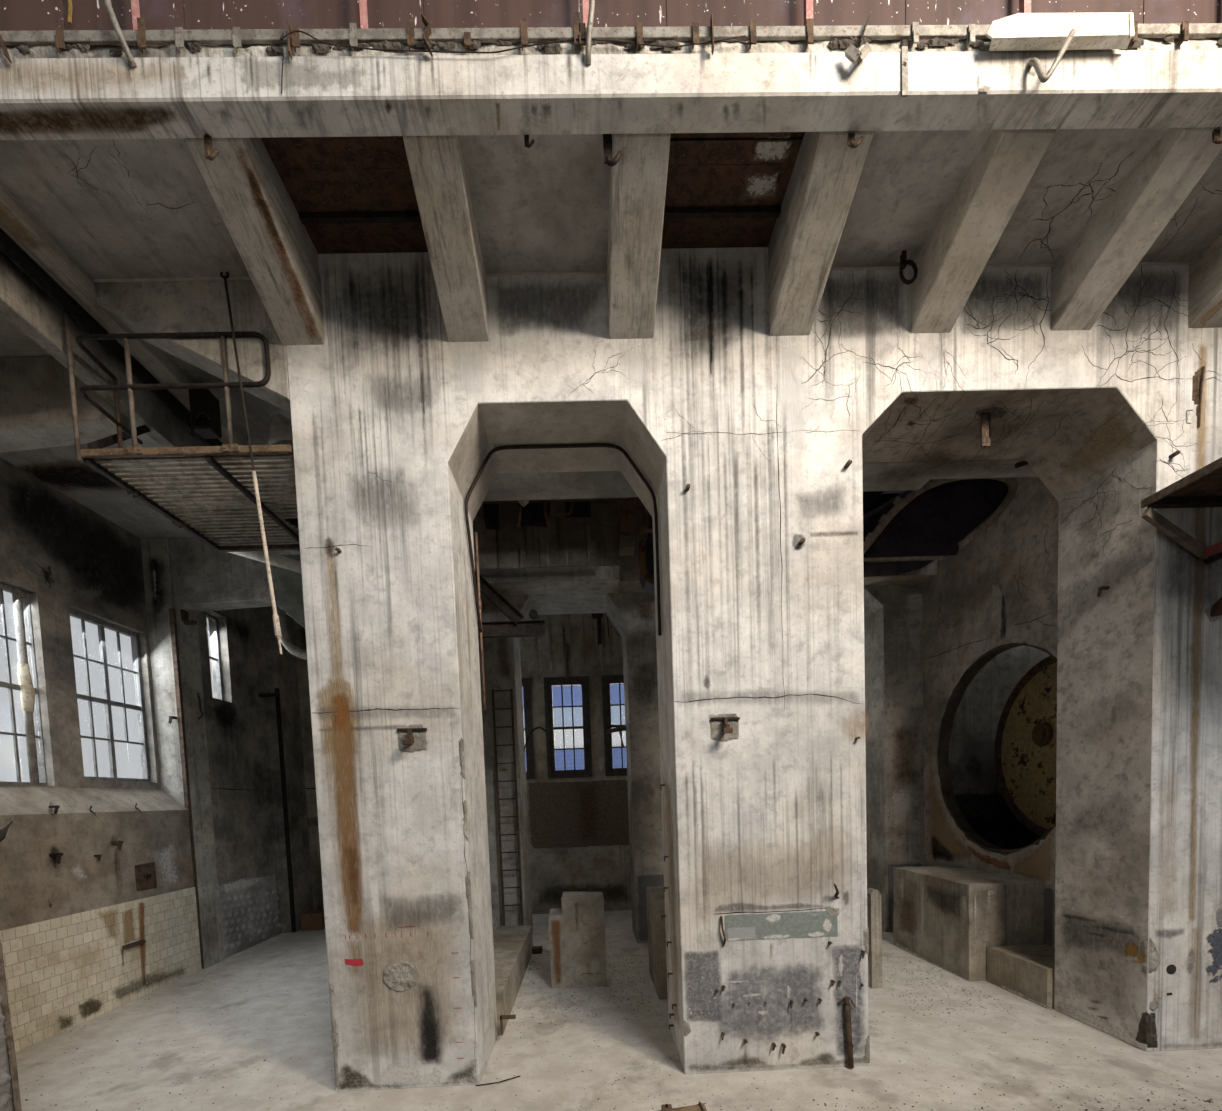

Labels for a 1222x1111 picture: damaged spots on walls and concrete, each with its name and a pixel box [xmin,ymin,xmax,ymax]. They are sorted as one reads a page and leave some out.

crack [64,139,193,222]
rust [240,152,316,338]
crack [661,154,1222,640]
rust [321,552,361,932]
crack [675,679,861,704]